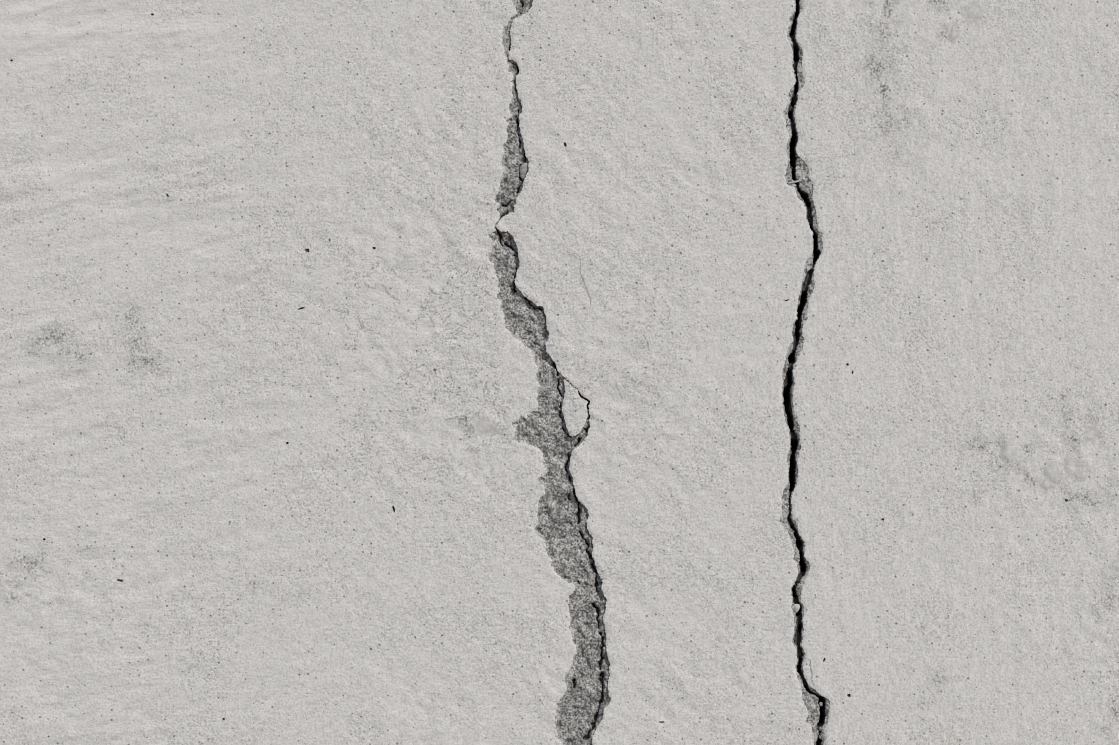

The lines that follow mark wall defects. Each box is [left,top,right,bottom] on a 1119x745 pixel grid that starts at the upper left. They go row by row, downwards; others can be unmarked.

crack [489,0,611,745]
crack [780,0,830,745]